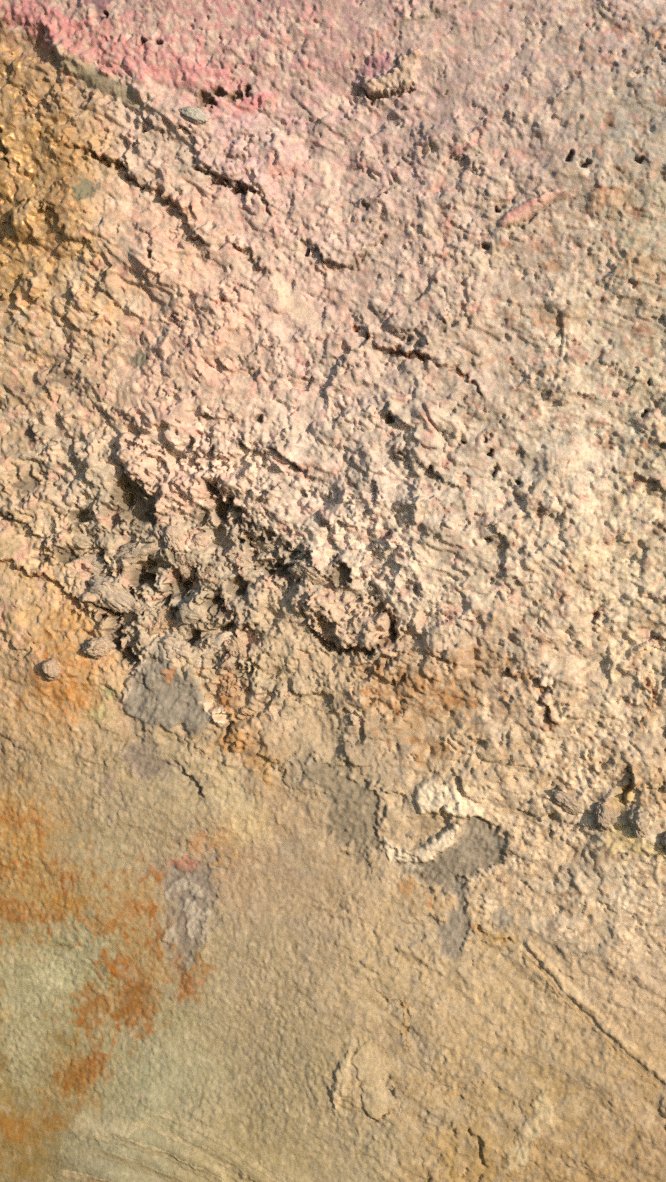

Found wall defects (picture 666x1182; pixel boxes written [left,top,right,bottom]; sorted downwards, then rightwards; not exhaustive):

crack [58,118,276,281]
crack [297,232,388,272]
corrosion [0,572,234,1182]
flaking render [0,432,517,966]